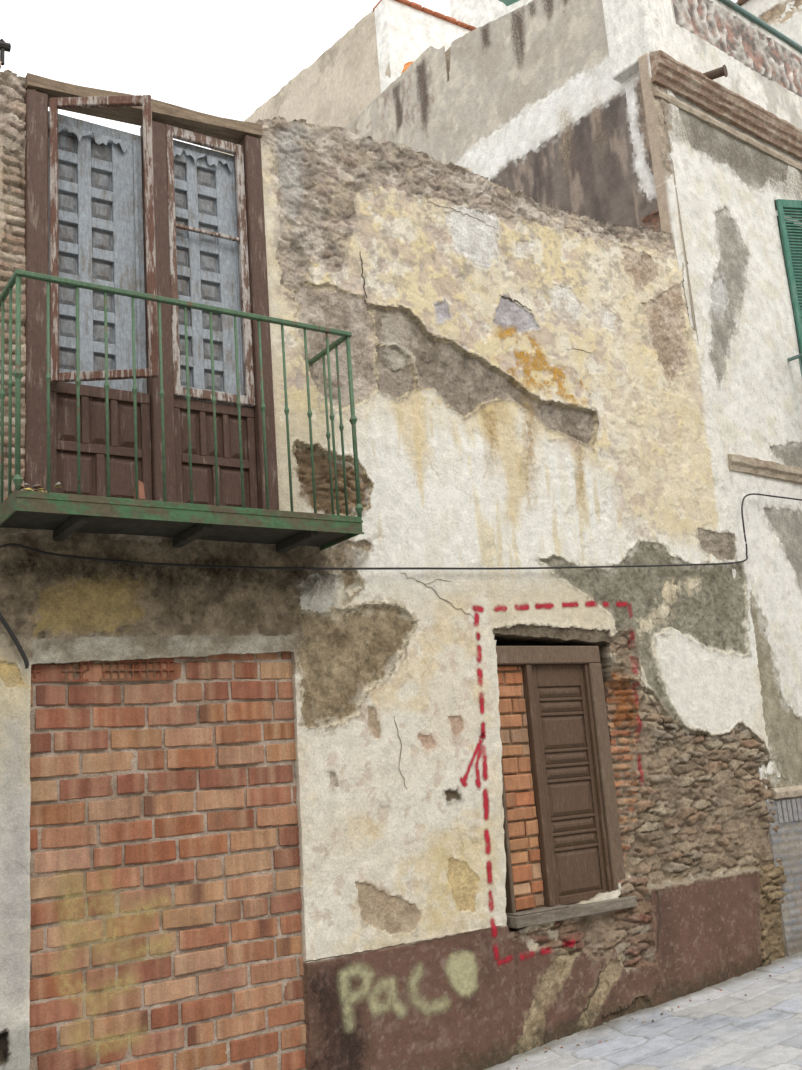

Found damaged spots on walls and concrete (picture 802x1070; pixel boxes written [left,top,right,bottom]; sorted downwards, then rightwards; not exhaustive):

water stain [512,0,566,63]
water stain [393,85,402,128]
water stain [416,60,428,127]
flaking render [0,61,32,493]
flaking render [258,116,676,410]
peeling [641,284,689,381]
peeling [709,206,750,384]
flaking render [294,442,373,515]
peeling [764,506,802,591]
peeling [493,528,802,789]
flaking render [367,707,381,738]
flaking render [355,882,422,934]